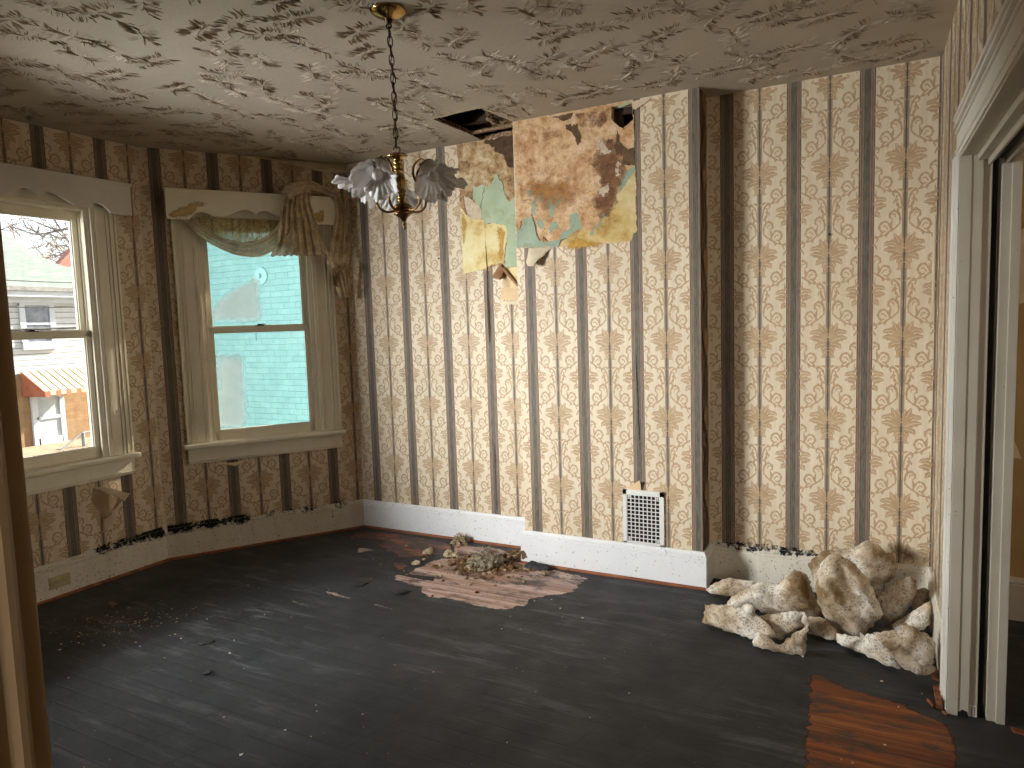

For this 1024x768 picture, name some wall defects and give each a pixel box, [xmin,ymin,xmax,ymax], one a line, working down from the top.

spalling [434,108,514,168]
spalling [552,113,582,145]
spalling [597,97,650,197]
peeling [526,190,606,240]
leakage [94,504,251,554]
leakage [715,541,821,557]